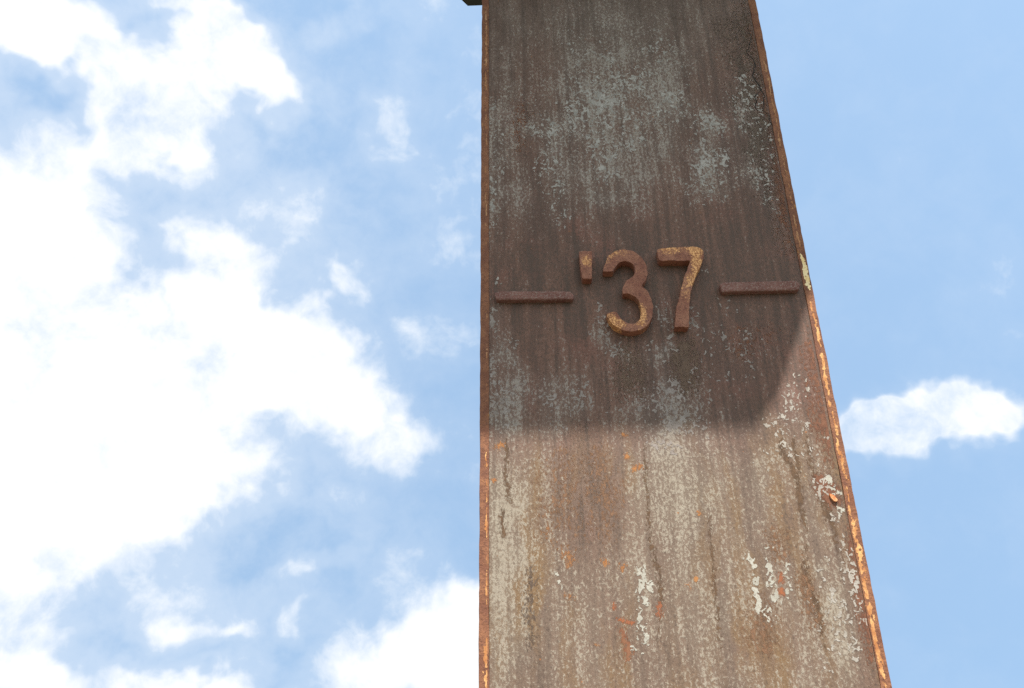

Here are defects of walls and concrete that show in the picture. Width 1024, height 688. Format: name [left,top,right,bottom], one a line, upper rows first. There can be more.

peeling [522,25,887,688]
corrosion [491,441,512,538]
corrosion [532,443,664,632]
corrosion [686,510,722,648]
corrosion [739,526,826,657]
corrosion [778,325,874,669]